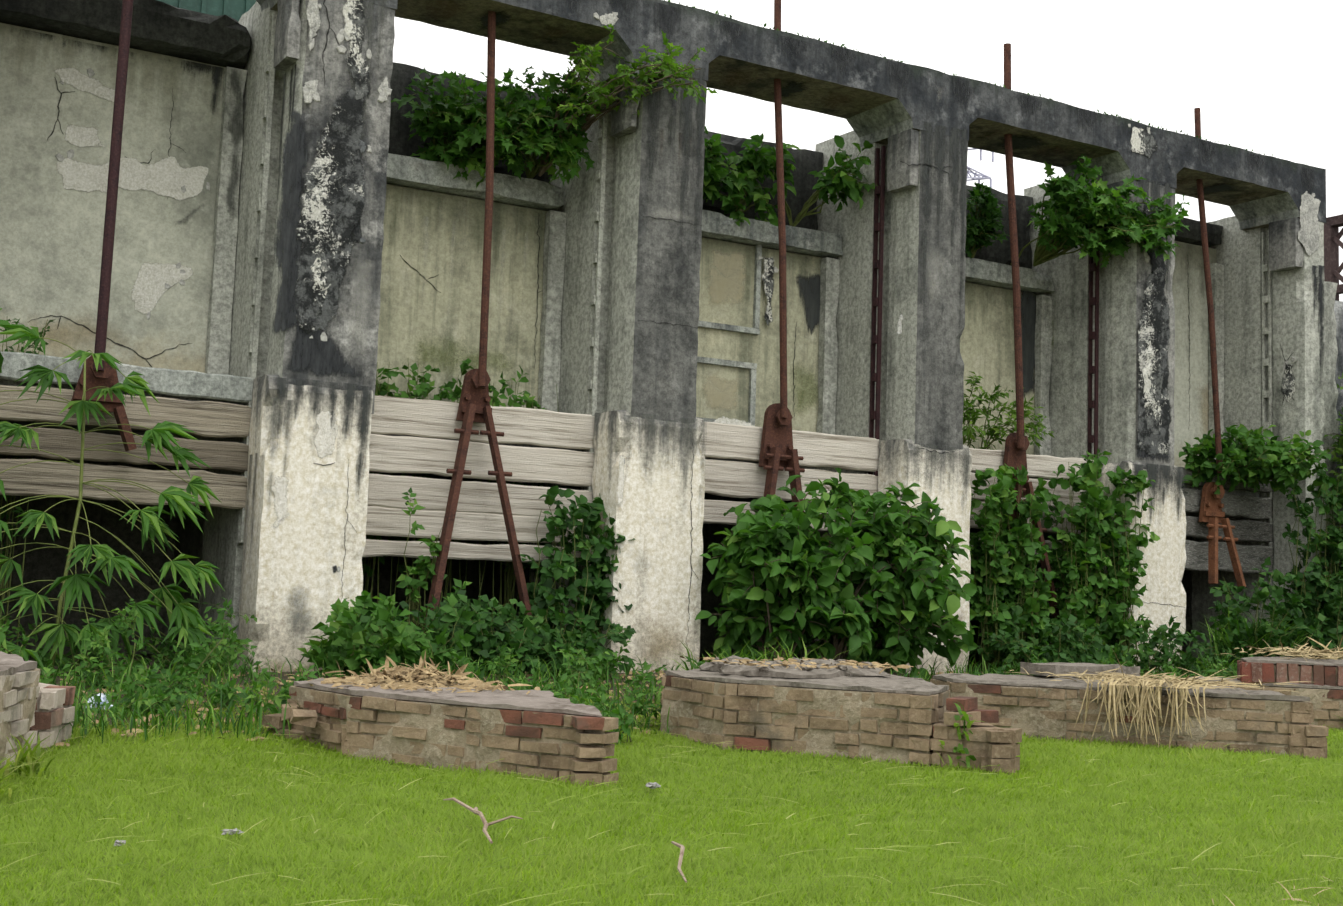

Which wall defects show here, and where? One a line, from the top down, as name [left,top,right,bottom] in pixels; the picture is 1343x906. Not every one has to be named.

crack [47,78,75,140]
peeling [55,67,115,102]
peeling [55,124,210,201]
peeling [131,262,193,320]
water stain [246,65,371,535]
water stain [797,274,820,334]
crack [30,315,192,367]